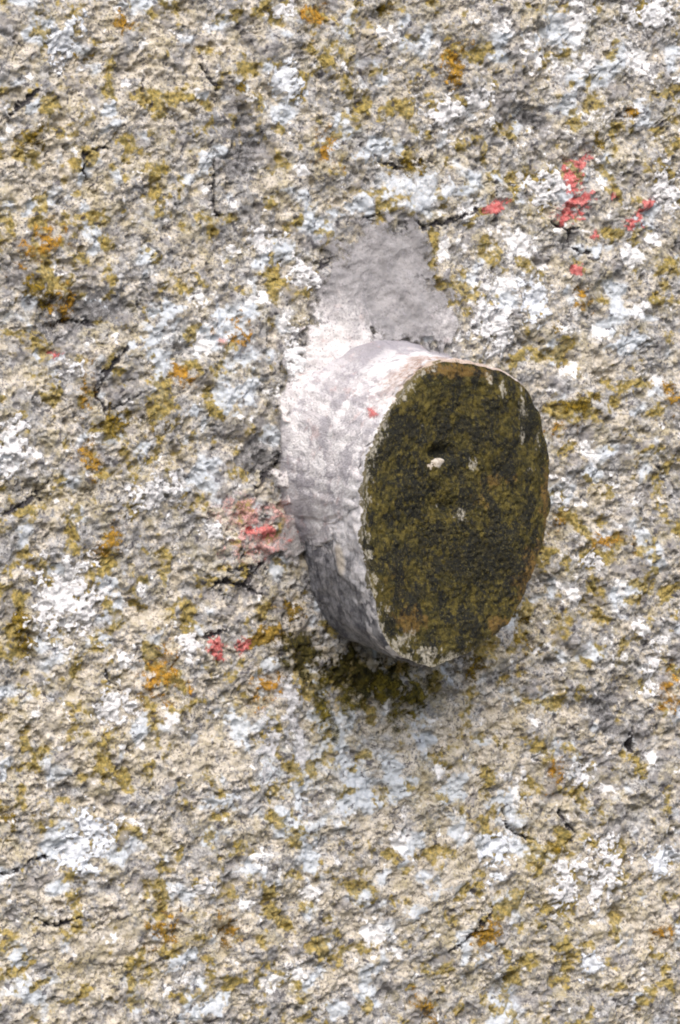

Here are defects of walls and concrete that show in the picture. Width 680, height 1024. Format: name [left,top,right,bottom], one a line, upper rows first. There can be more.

crack [198,64,221,92]
crack [208,161,219,217]
crack [93,345,138,411]
water stain [246,597,440,796]